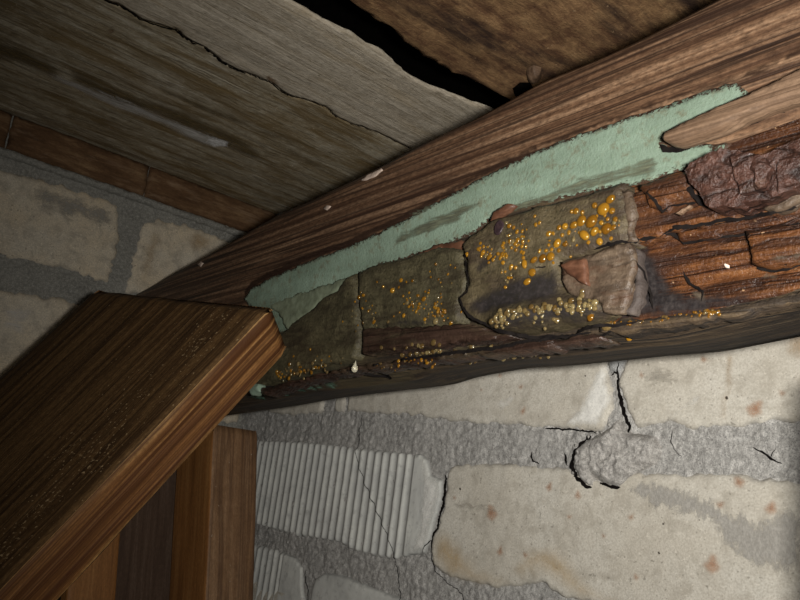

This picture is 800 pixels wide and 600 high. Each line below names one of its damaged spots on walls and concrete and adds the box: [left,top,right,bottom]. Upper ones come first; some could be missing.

crack [105,0,409,148]
crack [355,415,401,600]
crack [422,475,464,600]
crack [545,427,620,489]
crack [611,363,631,433]
crack [753,447,782,464]